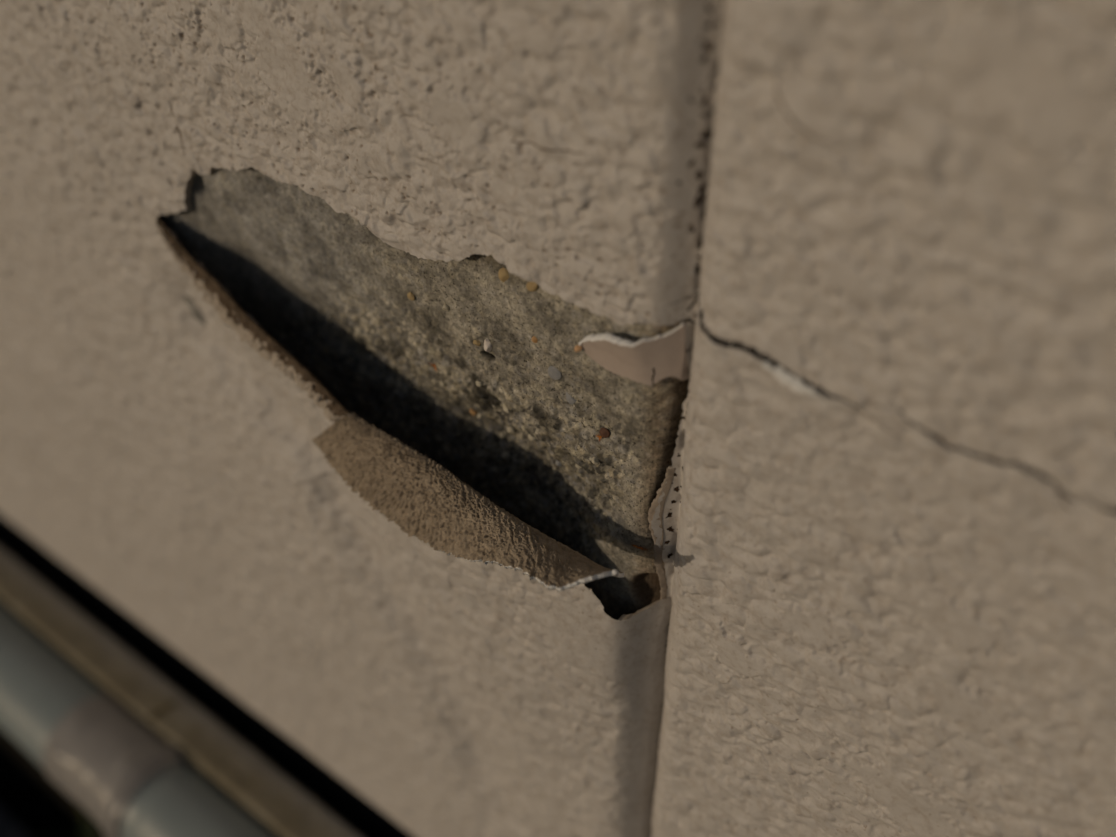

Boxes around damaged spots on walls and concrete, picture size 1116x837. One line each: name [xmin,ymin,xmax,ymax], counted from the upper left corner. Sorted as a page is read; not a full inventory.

peeling [155,167,692,620]
crack [670,292,1116,514]